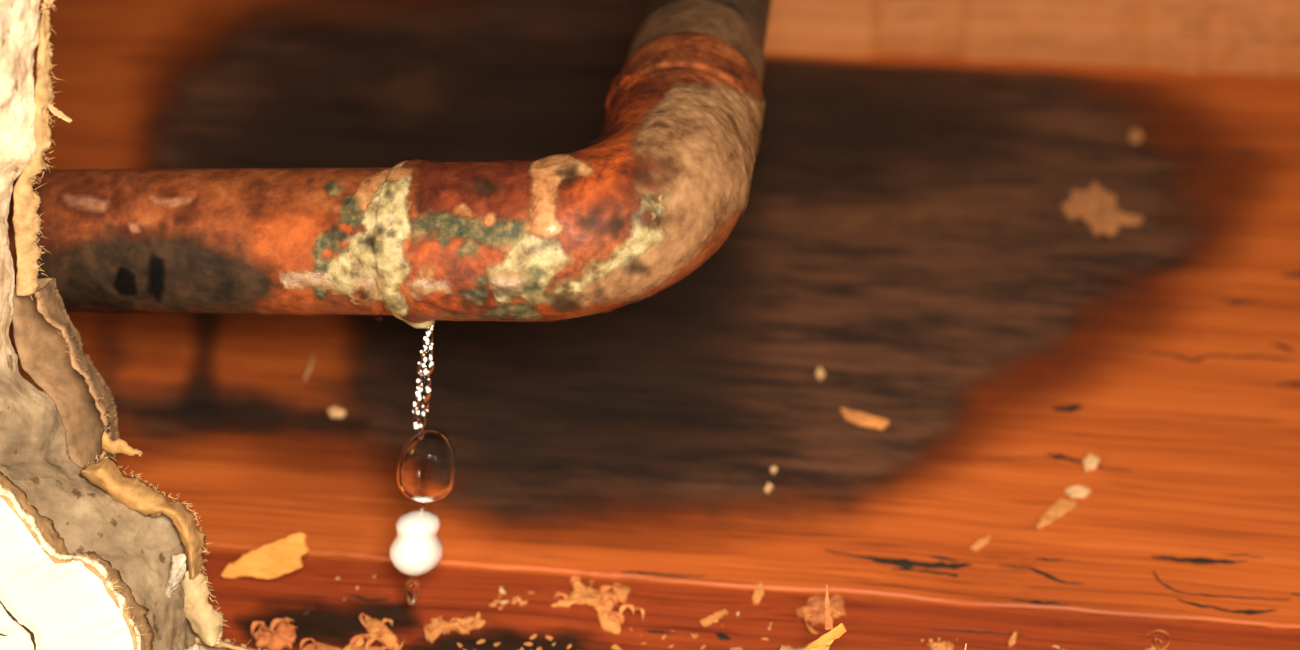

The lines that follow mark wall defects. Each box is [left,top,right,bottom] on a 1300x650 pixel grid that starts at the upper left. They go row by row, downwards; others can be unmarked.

corrosion [554,72,656,244]
corrosion [322,214,353,258]
corrosion [409,238,509,315]
corrosion [529,286,656,321]
water stain [37,0,1245,524]
flaking render [165,553,187,598]